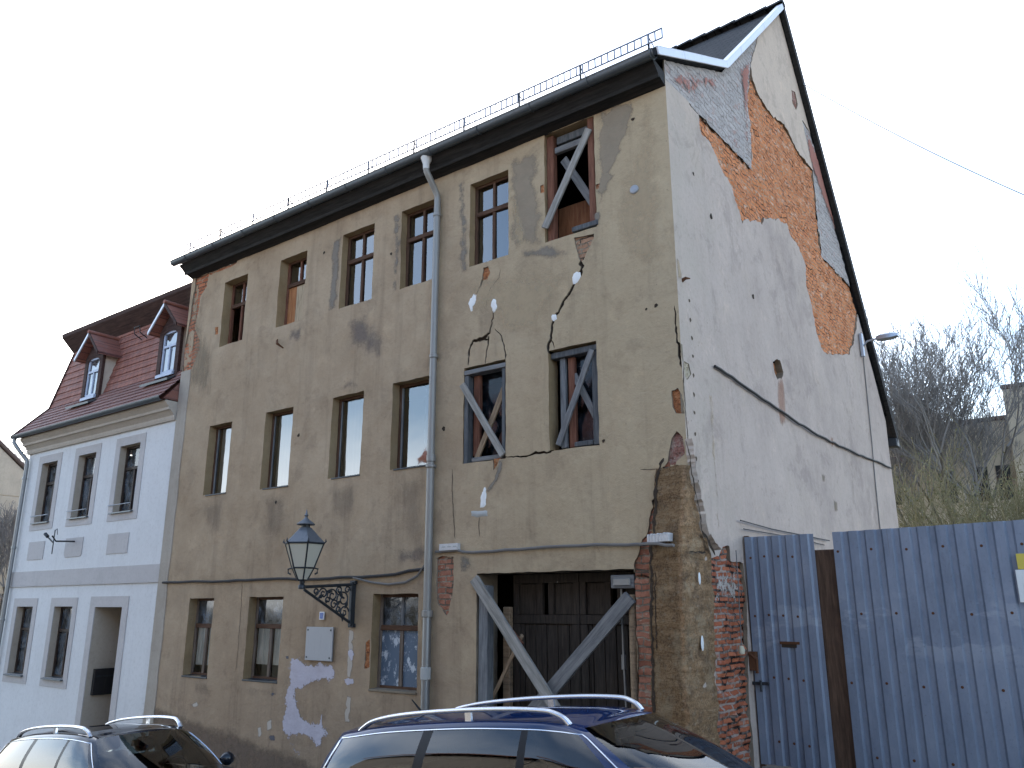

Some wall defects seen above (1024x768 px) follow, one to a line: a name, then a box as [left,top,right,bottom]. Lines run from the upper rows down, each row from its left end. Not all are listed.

spalling [664,38,856,355]
spalling [575,235,594,261]
spalling [184,262,237,371]
crack [468,270,507,364]
crack [548,261,584,354]
crack [674,310,682,365]
crack [511,450,554,458]
spalling [437,556,454,615]
spalling [635,509,654,712]
spalling [664,432,751,765]